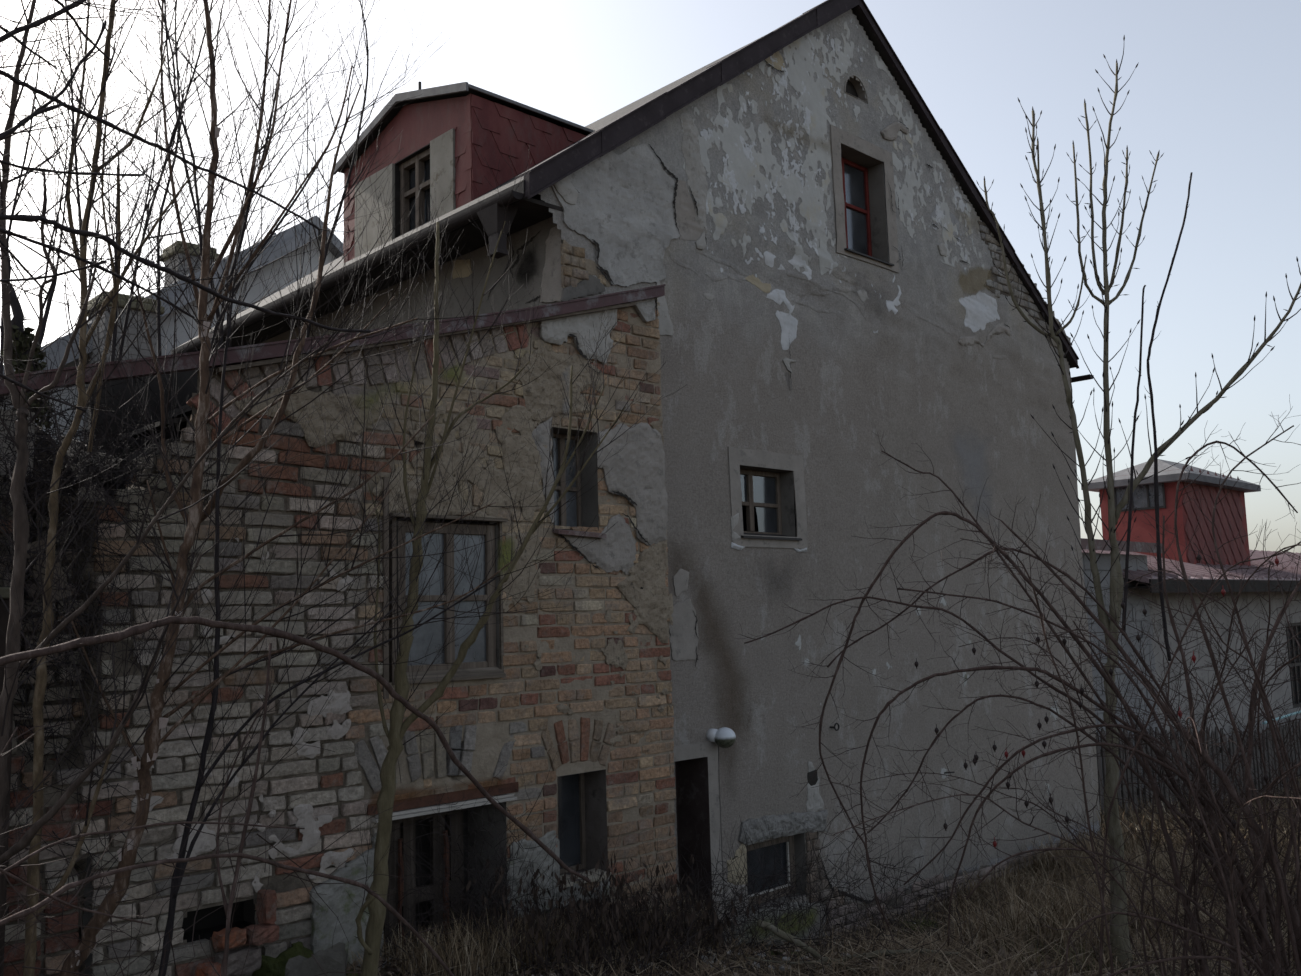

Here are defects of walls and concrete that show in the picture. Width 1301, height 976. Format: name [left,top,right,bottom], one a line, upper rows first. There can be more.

crack [649,144,707,245]
peeling [551,18,1072,373]
crack [592,239,615,285]
peeling [539,309,617,364]
peeling [532,417,668,573]
peeling [329,568,355,591]
peeling [503,532,541,612]
peeling [201,626,236,646]
peeling [291,690,352,758]
peeling [131,796,164,813]
peeling [166,824,216,859]
peeling [309,848,354,879]